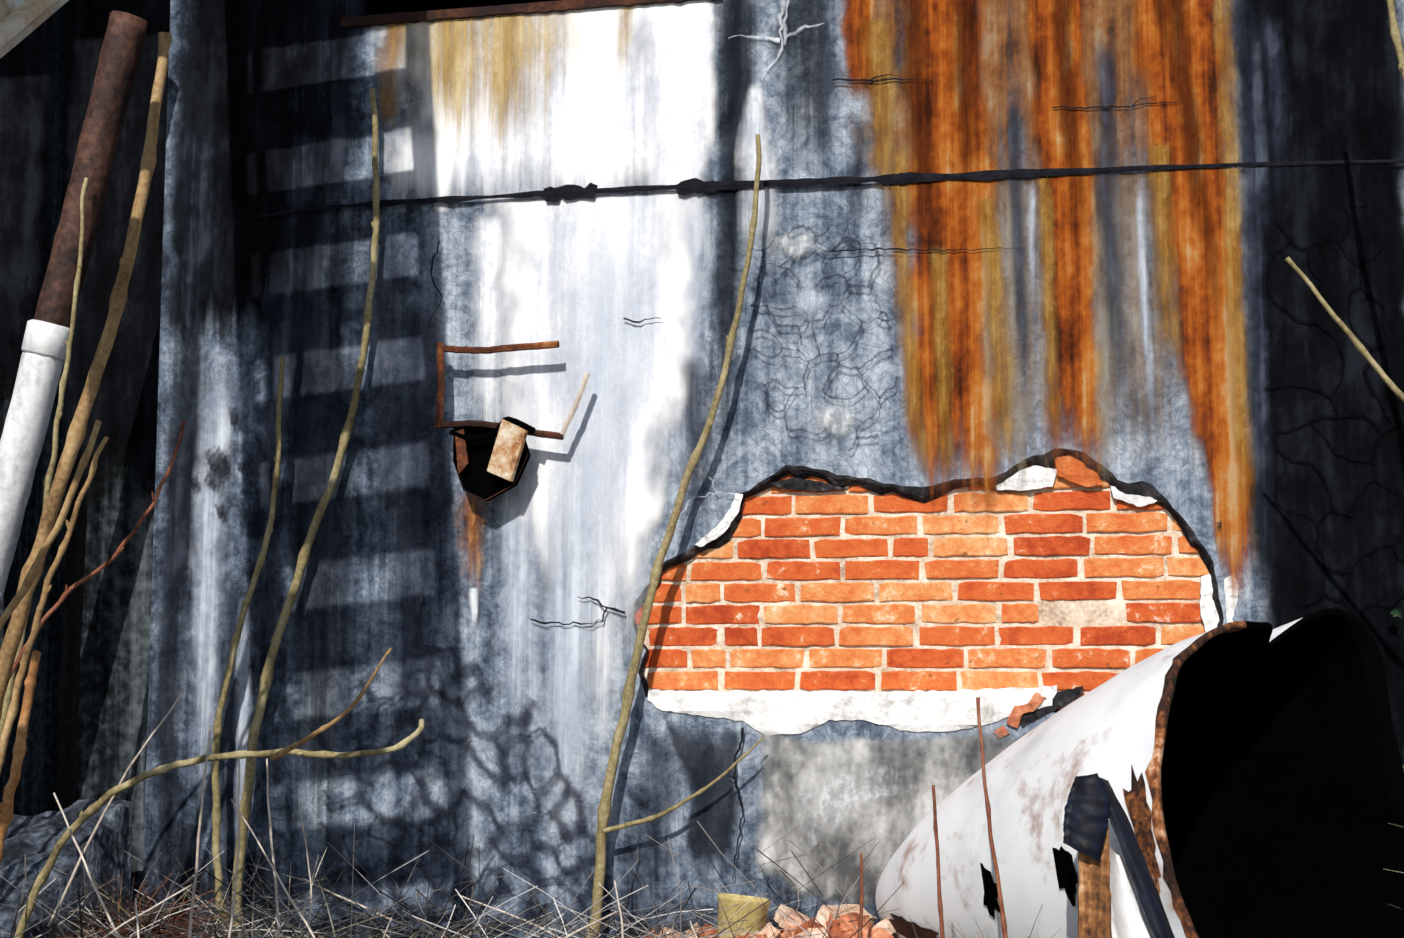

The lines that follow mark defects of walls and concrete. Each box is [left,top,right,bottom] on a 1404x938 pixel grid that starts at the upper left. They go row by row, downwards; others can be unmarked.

water stain [64,0,359,851]
corrosion [465,494,481,619]
spalling [456,428,531,502]
water stain [375,0,755,768]
crack [530,596,625,627]
crack [662,469,738,540]
crack [258,0,1404,451]
spalling [629,448,1239,738]
corrosion [842,0,1254,587]
water stain [1236,0,1404,765]
crack [316,644,612,938]